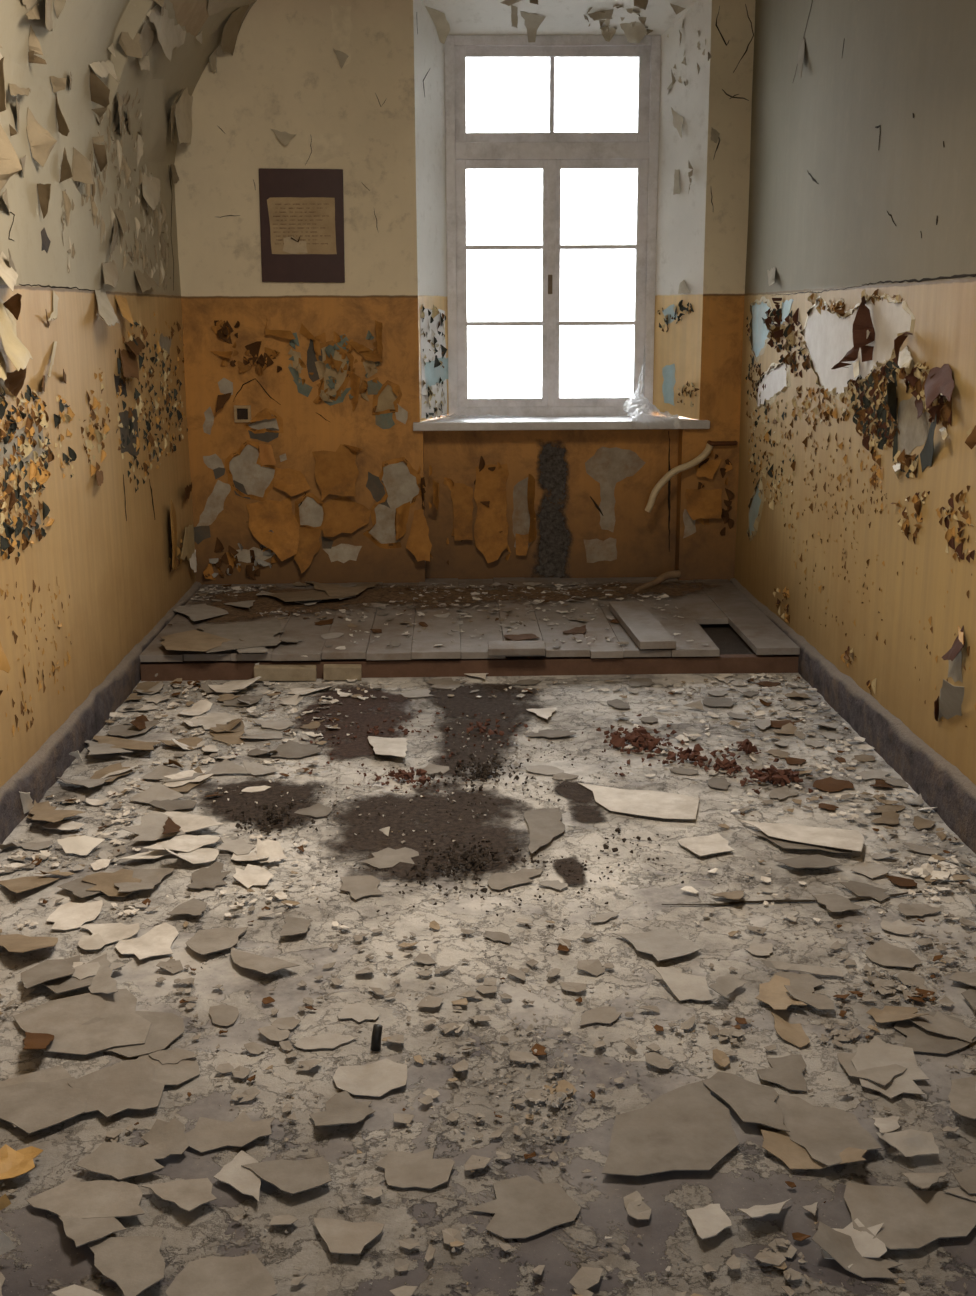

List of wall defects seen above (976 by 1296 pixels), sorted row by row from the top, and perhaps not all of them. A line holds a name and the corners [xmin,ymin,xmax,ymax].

peeling [500,0,546,42]
peeling [584,0,706,138]
peeling [0,0,450,565]
peeling [657,280,694,332]
peeling [662,364,700,407]
peeling [169,408,537,601]
peeling [583,447,646,563]
peeling [683,289,975,668]
peeling [0,580,72,736]
peeling [260,582,708,650]
peeling [910,591,976,727]
peeling [20,792,33,814]